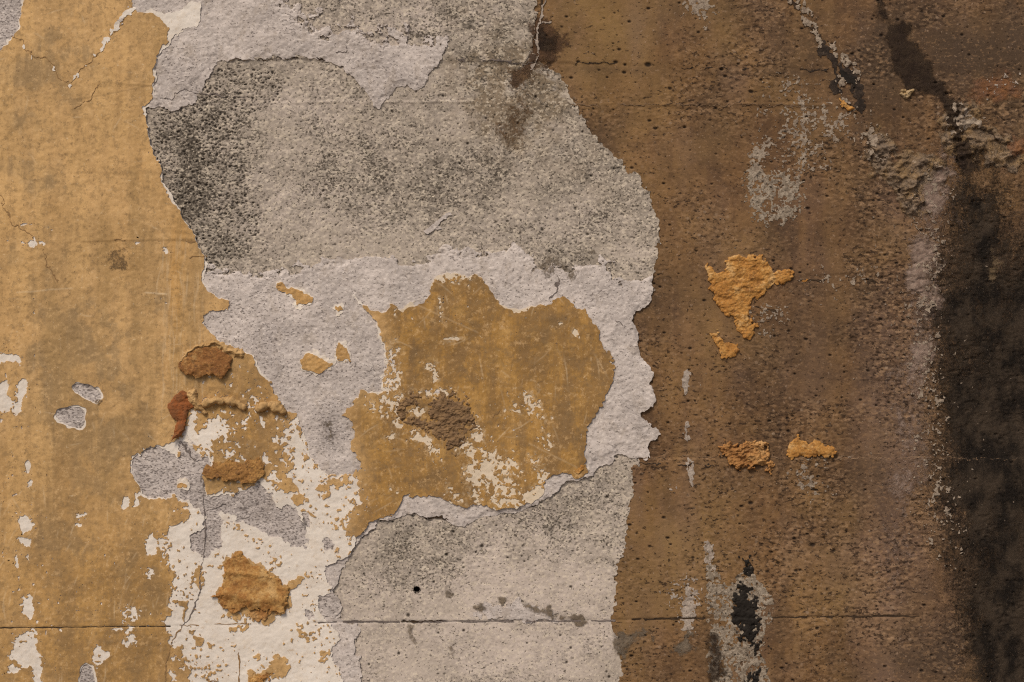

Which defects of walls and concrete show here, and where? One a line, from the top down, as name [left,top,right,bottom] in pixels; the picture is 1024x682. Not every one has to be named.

peeling [0,0,24,50]
peeling [7,221,45,248]
peeling [78,0,661,682]
damp [876,0,1024,682]
peeling [0,347,38,429]
peeling [54,382,103,430]
peeling [0,455,62,682]
crack [318,616,710,624]
spalling [703,540,774,682]
crack [771,612,915,620]